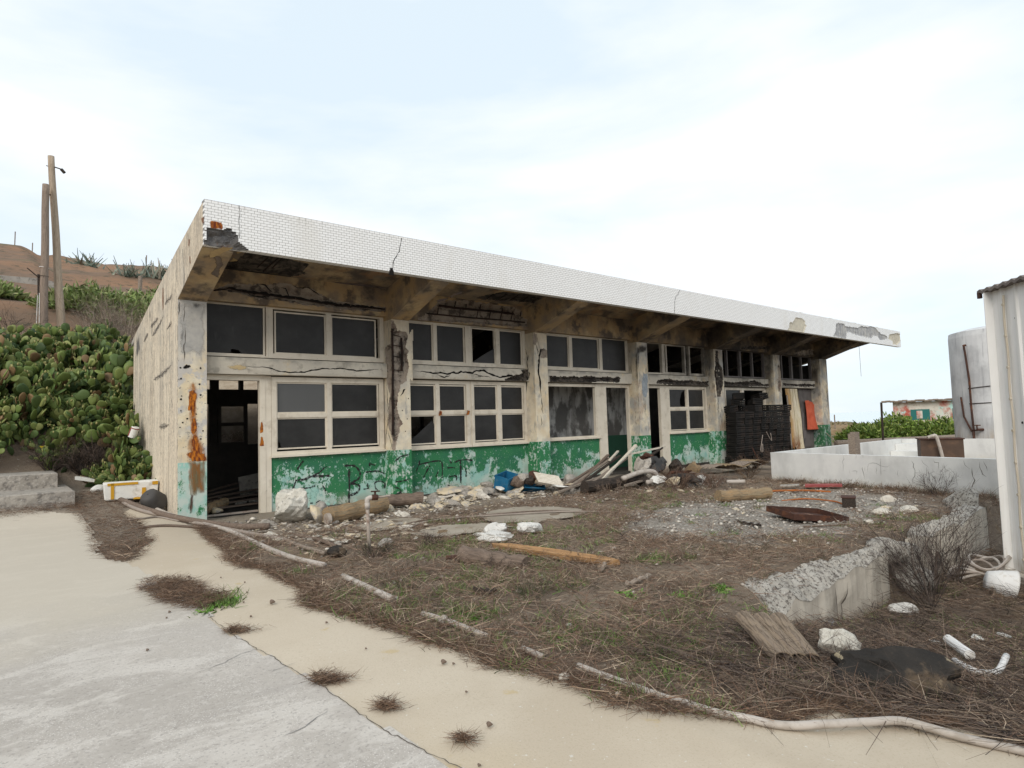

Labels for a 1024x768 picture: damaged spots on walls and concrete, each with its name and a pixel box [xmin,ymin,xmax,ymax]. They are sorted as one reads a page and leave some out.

crack [215,284,385,309]
spalling [204,227,409,451]
peeling [788,317,807,333]
peeling [833,323,901,345]
crack [249,366,392,446]
crack [417,338,543,425]
spalling [642,350,768,410]
corrosion [188,384,206,511]
peeling [415,473,482,494]